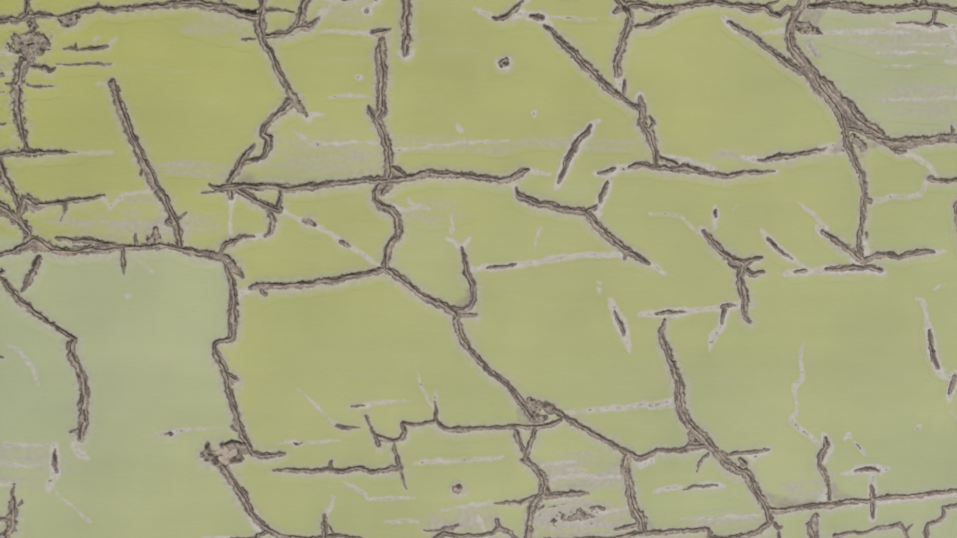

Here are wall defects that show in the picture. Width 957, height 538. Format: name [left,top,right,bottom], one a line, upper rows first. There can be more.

crack [0,0,957,284]
crack [0,208,957,538]